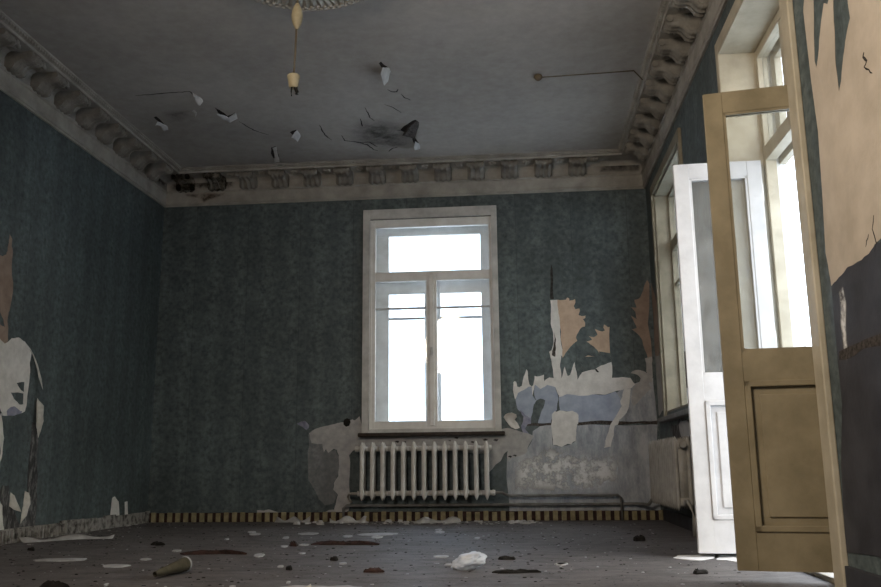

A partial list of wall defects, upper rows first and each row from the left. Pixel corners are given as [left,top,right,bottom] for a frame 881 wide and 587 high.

peeling [379,62,391,86]
peeling [401,120,420,150]
flaking render [803,0,881,286]
flaking render [0,337,32,461]
peeling [297,353,663,512]